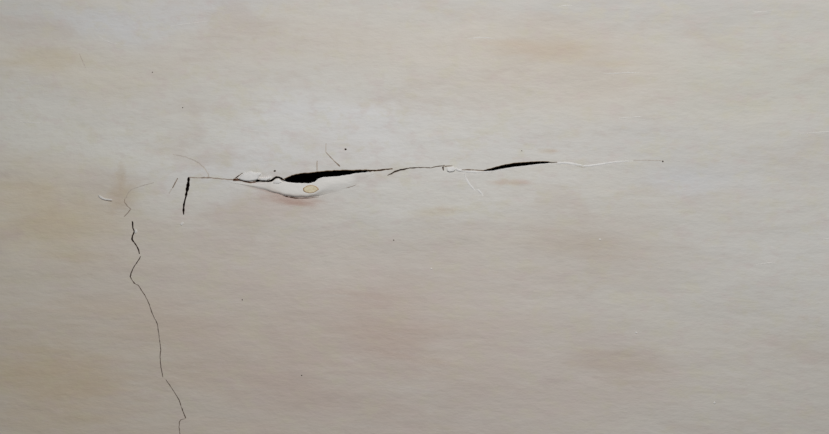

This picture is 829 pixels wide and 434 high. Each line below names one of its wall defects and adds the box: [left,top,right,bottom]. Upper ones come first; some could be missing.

crack [124,143,557,434]